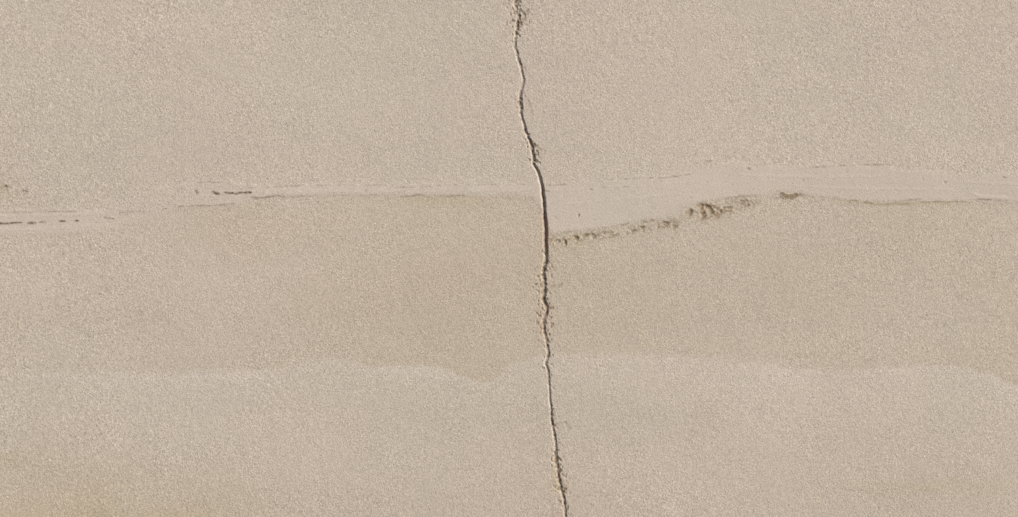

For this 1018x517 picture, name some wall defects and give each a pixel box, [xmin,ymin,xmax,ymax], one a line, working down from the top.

spalling [547,195,763,250]
spalling [779,191,806,200]